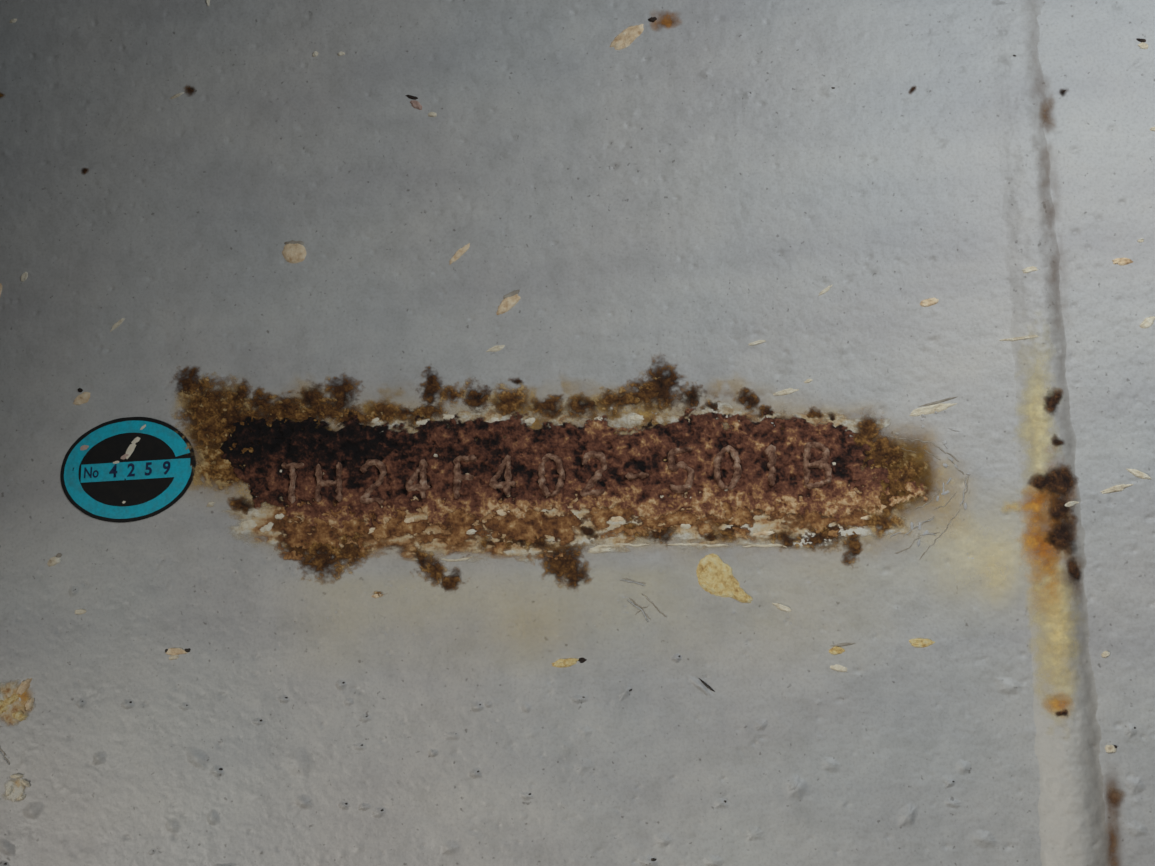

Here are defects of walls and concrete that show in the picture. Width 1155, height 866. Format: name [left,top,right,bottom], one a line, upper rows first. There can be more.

rust [174,360,970,590]
rust [1009,367,1080,716]